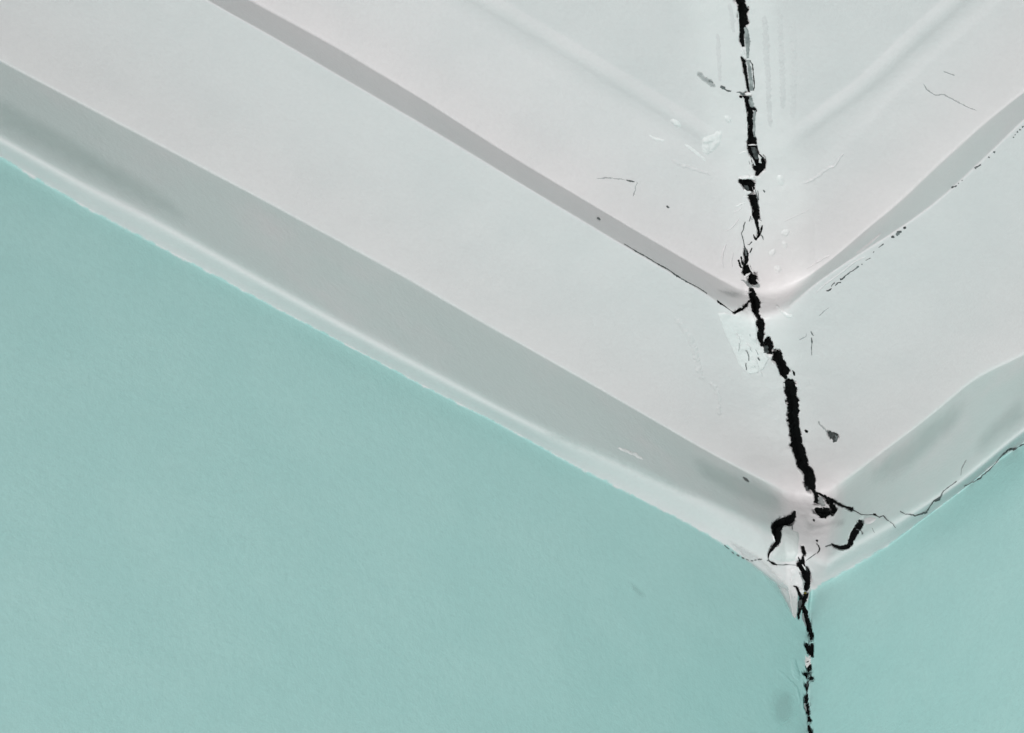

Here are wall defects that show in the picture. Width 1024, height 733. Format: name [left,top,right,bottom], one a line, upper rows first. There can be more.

peeling [718,304,769,377]
crack [625,0,1024,733]